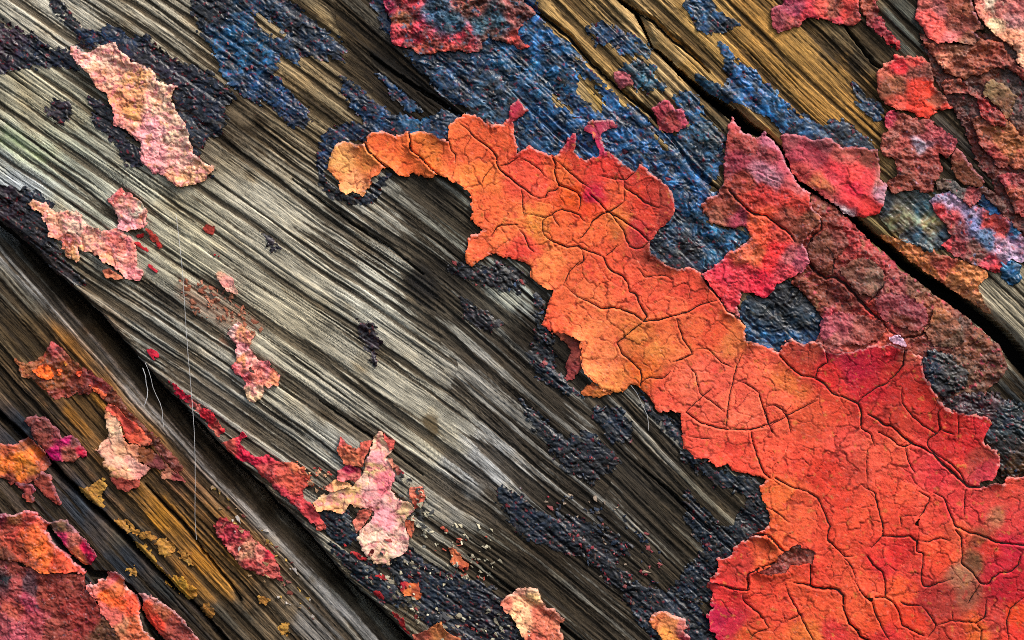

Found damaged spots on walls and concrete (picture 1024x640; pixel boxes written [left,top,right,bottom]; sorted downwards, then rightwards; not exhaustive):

peeling [70,42,214,187]
crack [536,12,666,133]
peeling [29,188,163,281]
peeling [227,322,280,402]
peeling [327,99,1024,640]
crack [373,57,1024,640]
peeling [0,361,199,640]
peeling [168,381,425,600]